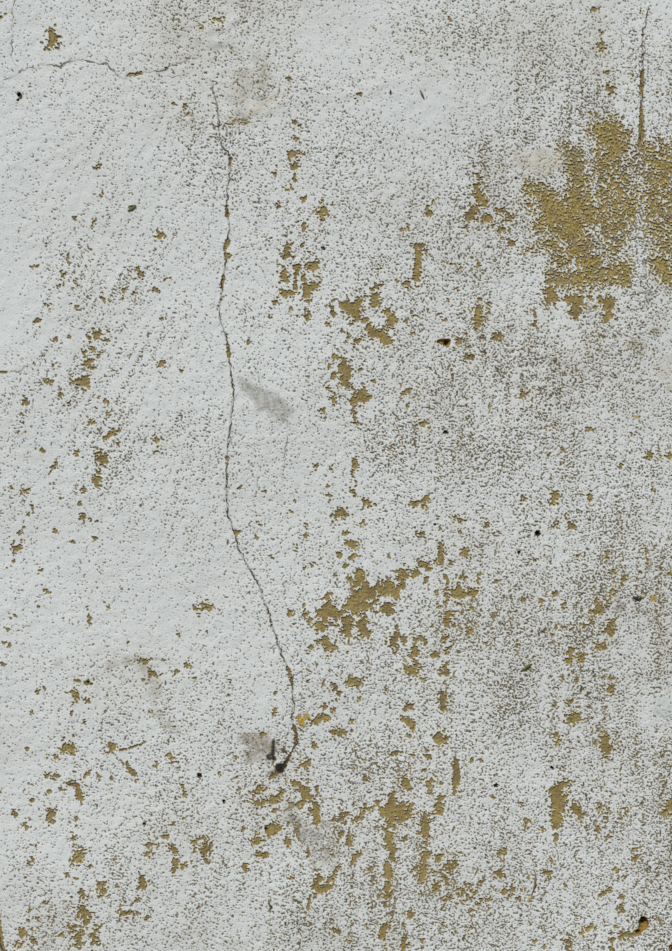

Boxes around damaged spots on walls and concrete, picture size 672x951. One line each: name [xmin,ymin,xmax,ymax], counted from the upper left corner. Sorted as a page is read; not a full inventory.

peeling [99,266,172,304]
peeling [452,295,504,369]
peeling [39,327,124,541]
crack [212,85,299,777]
peeling [4,485,41,569]
peeling [189,597,220,618]
peeling [134,653,197,682]
peeling [218,453,643,951]
peeling [0,675,140,951]
peeling [141,816,230,877]
crack [0,917,8,951]
peeling [115,871,153,923]